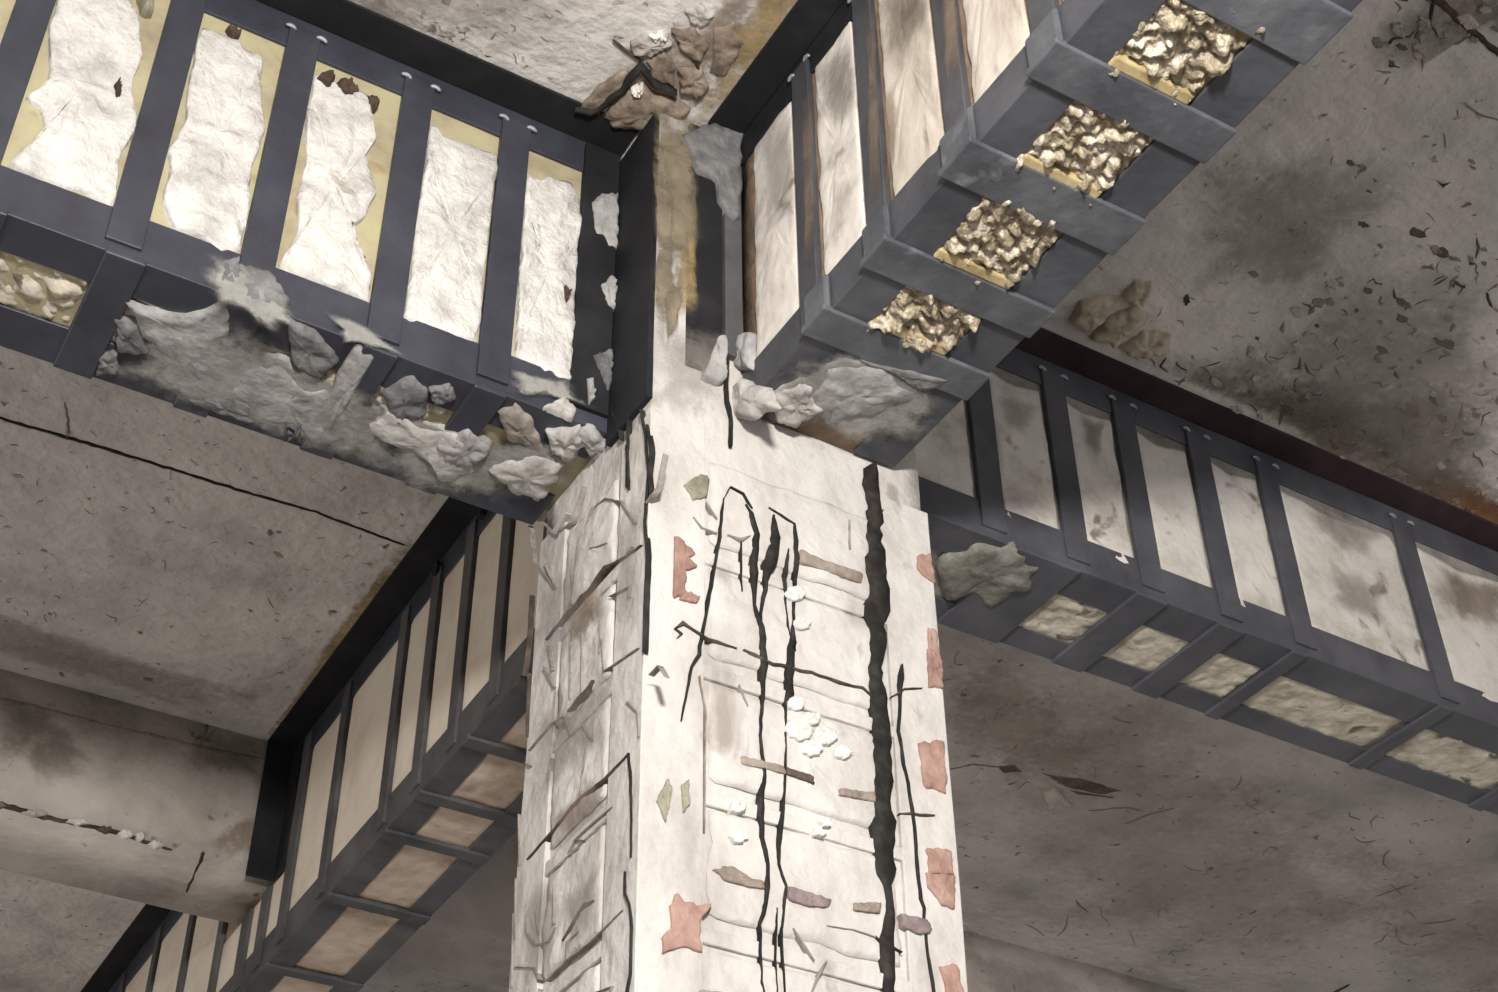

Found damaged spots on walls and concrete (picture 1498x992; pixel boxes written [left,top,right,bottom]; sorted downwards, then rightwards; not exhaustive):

spalling [225,24,242,40]
crack [1428,0,1498,56]
spalling [114,77,123,98]
spalling [317,70,380,114]
spalling [575,3,743,221]
crack [1444,103,1498,148]
peeling [96,299,229,381]
peeling [188,256,374,446]
peeling [369,349,614,502]
crack [723,354,733,449]
peeling [700,332,948,428]
crack [510,424,936,992]